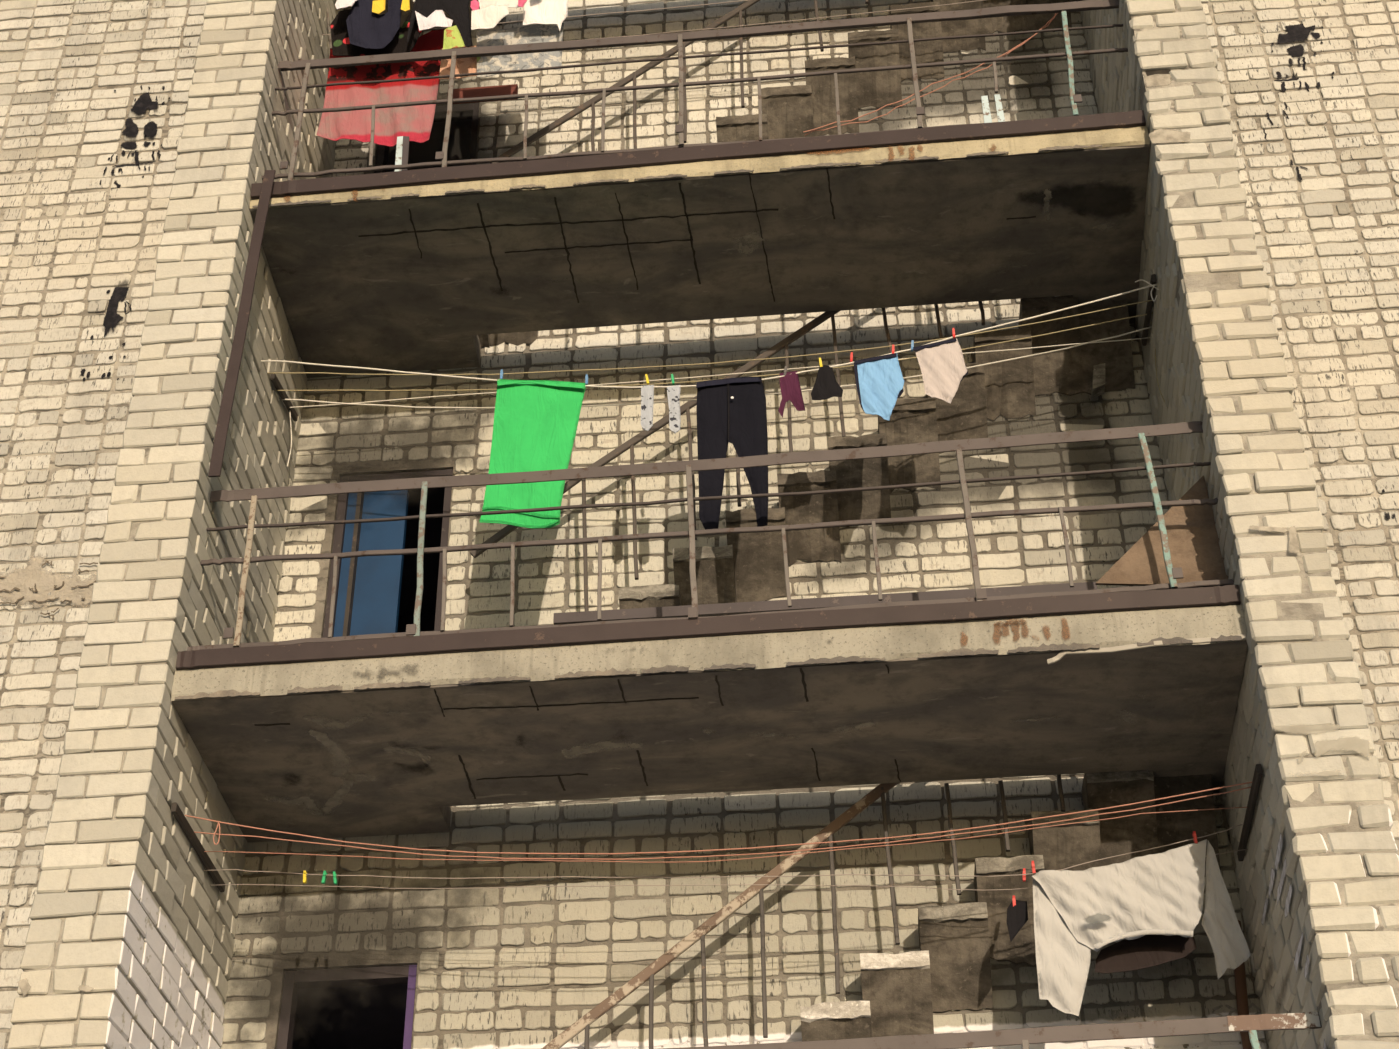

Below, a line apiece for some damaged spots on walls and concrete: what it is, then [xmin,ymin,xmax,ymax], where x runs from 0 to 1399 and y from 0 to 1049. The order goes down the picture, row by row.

water stain [1021,185,1133,217]
spalling [0,556,98,620]
corrosion [993,619,1069,643]